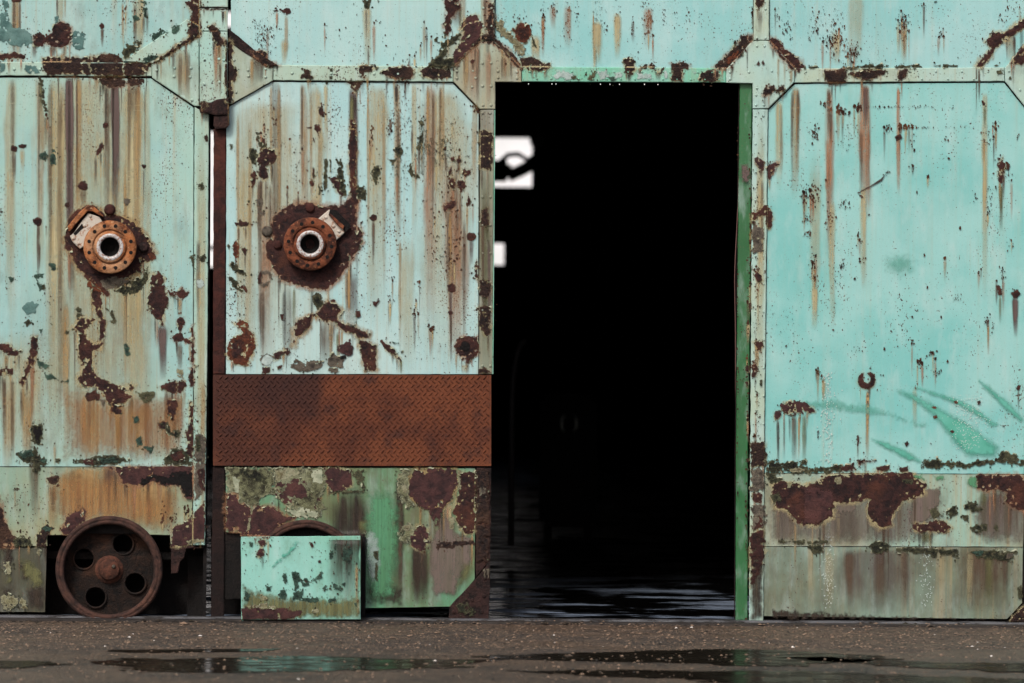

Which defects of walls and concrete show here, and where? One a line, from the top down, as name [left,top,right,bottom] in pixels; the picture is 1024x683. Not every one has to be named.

corrosion [0,0,278,553]
corrosion [226,0,551,377]
corrosion [743,325,764,392]
corrosion [622,12,920,283]
corrosion [975,19,1024,112]
peeling [225,462,328,519]
corrosion [395,463,494,593]
corrosion [746,367,1024,592]